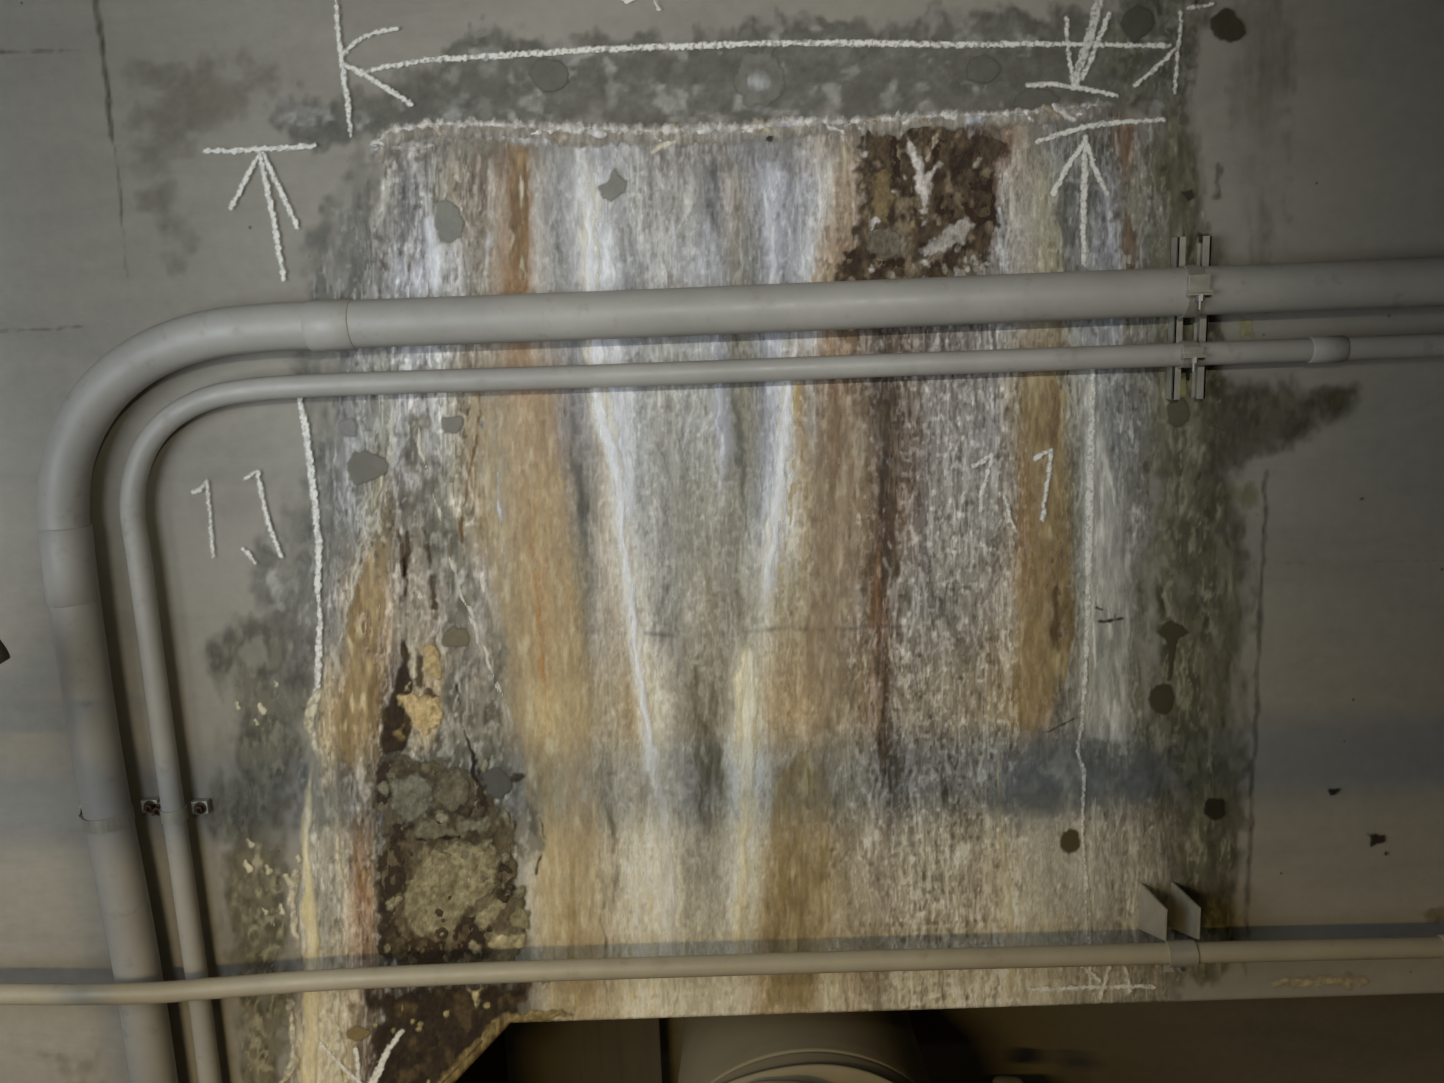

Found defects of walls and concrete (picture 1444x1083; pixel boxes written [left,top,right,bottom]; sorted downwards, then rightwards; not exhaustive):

rust [511,151,527,280]
damp [278,0,1206,300]
spalling [827,126,1005,281]
damp [337,317,1213,372]
rust [335,542,384,764]
spalling [425,543,437,610]
damp [207,365,1355,975]
rust [872,388,900,616]
rust [1011,371,1073,735]
spalling [373,642,530,965]
spalling [365,982,572,1083]
damp [240,963,1225,1083]